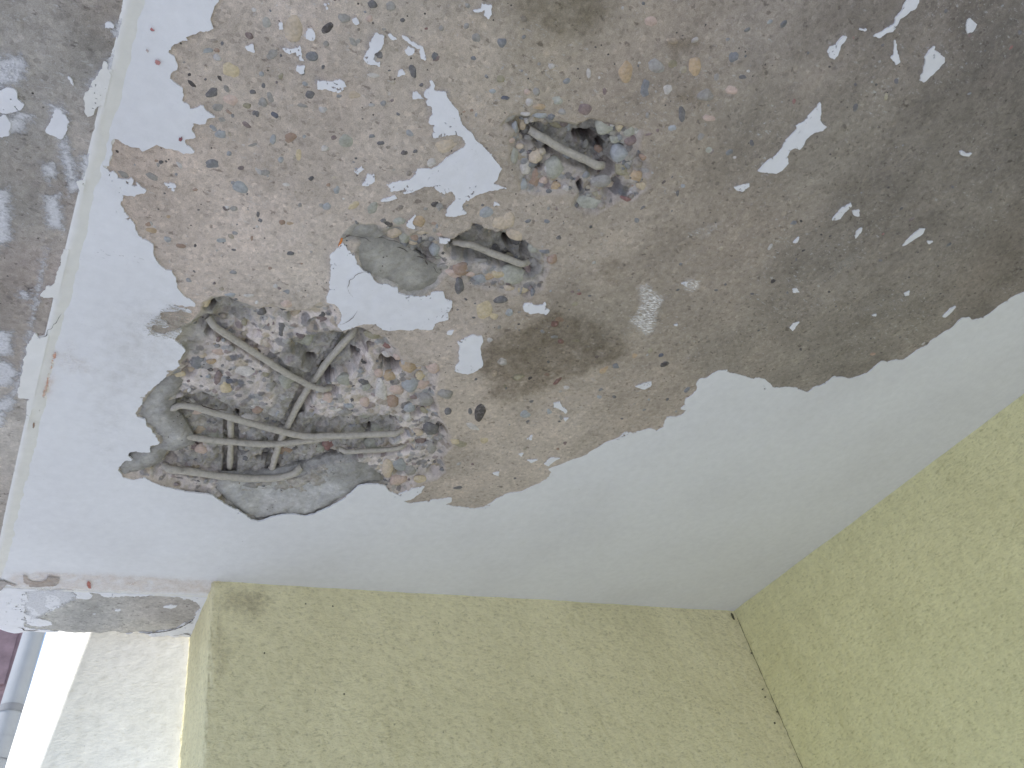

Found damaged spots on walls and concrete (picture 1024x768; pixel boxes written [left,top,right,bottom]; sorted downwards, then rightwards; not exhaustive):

peeling [0,54,34,137]
peeling [83,56,114,117]
peeling [41,104,89,231]
peeling [0,189,13,245]
peeling [105,0,1024,520]
peeling [0,249,69,430]
peeling [0,575,207,638]